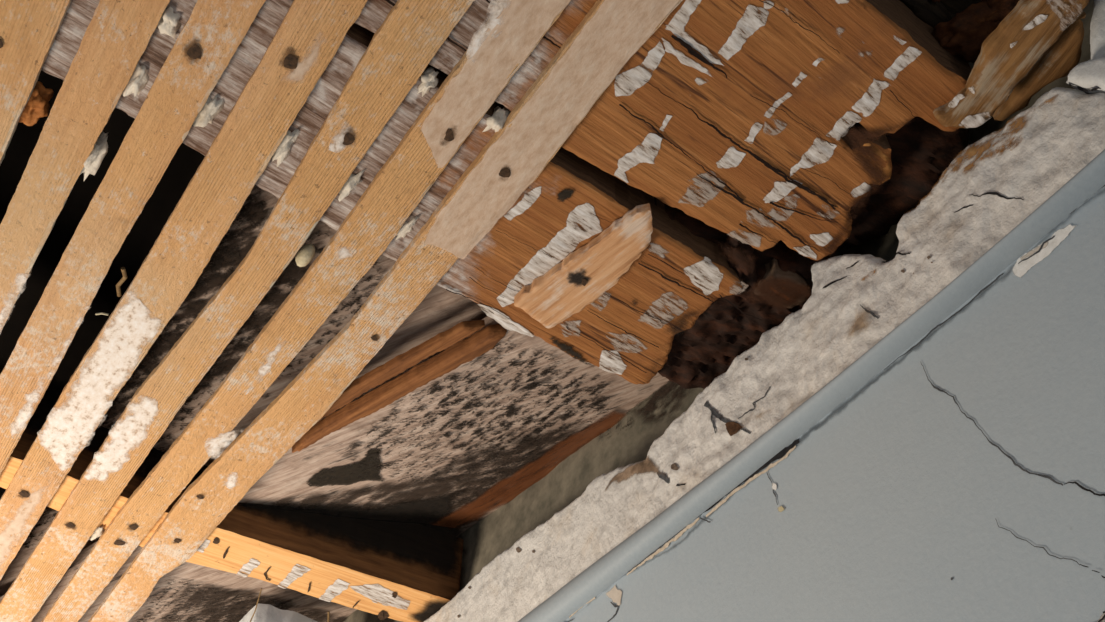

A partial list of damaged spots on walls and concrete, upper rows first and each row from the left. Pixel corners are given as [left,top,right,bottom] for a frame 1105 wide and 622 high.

water stain [25,377,66,433]
water stain [185,465,208,489]
water stain [236,335,686,575]
crack [627,438,799,575]
crack [704,386,771,436]
spalling [423,87,1105,622]
crack [884,273,1105,496]
crack [995,518,1105,578]